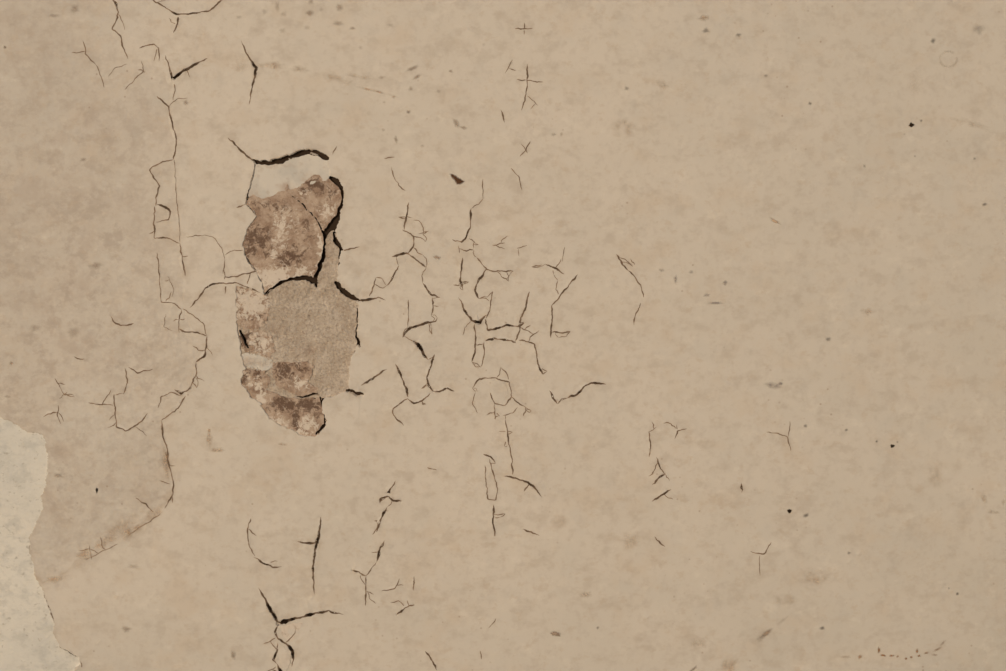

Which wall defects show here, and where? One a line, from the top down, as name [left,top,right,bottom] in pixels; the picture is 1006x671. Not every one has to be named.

crack [72,0,260,337]
crack [501,59,541,123]
crack [511,141,531,189]
crack [44,368,152,433]
peeling [130,337,212,534]
flaking render [228,138,387,437]
crack [369,157,605,536]
peeling [0,417,82,671]
crack [247,517,341,671]
crack [353,482,415,614]